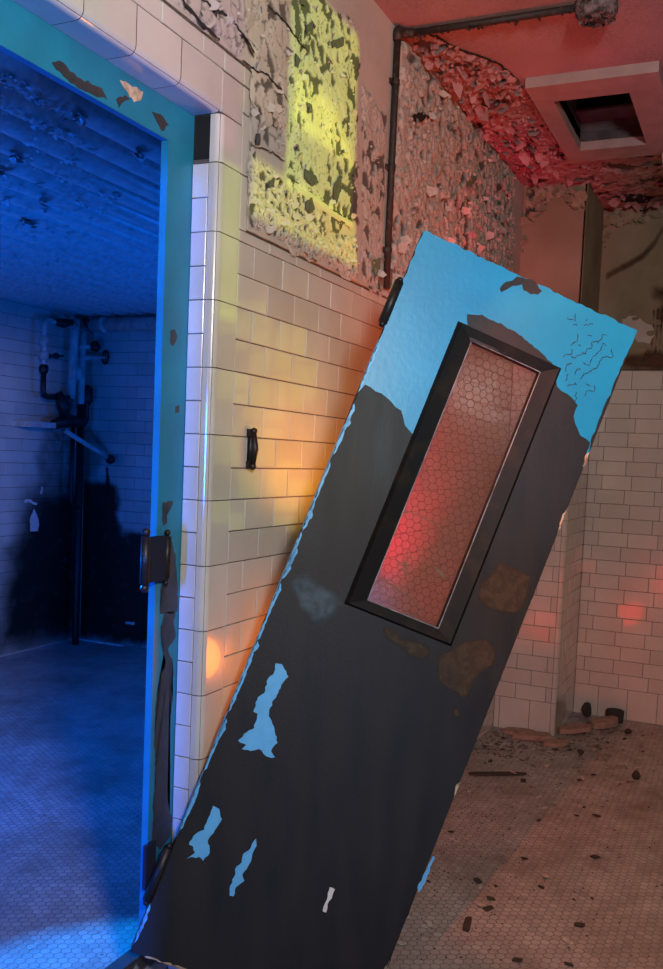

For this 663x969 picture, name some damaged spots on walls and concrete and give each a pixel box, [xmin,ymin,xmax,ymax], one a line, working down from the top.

peeling [52,60,143,107]
peeling [152,112,169,131]
peeling [172,0,663,297]